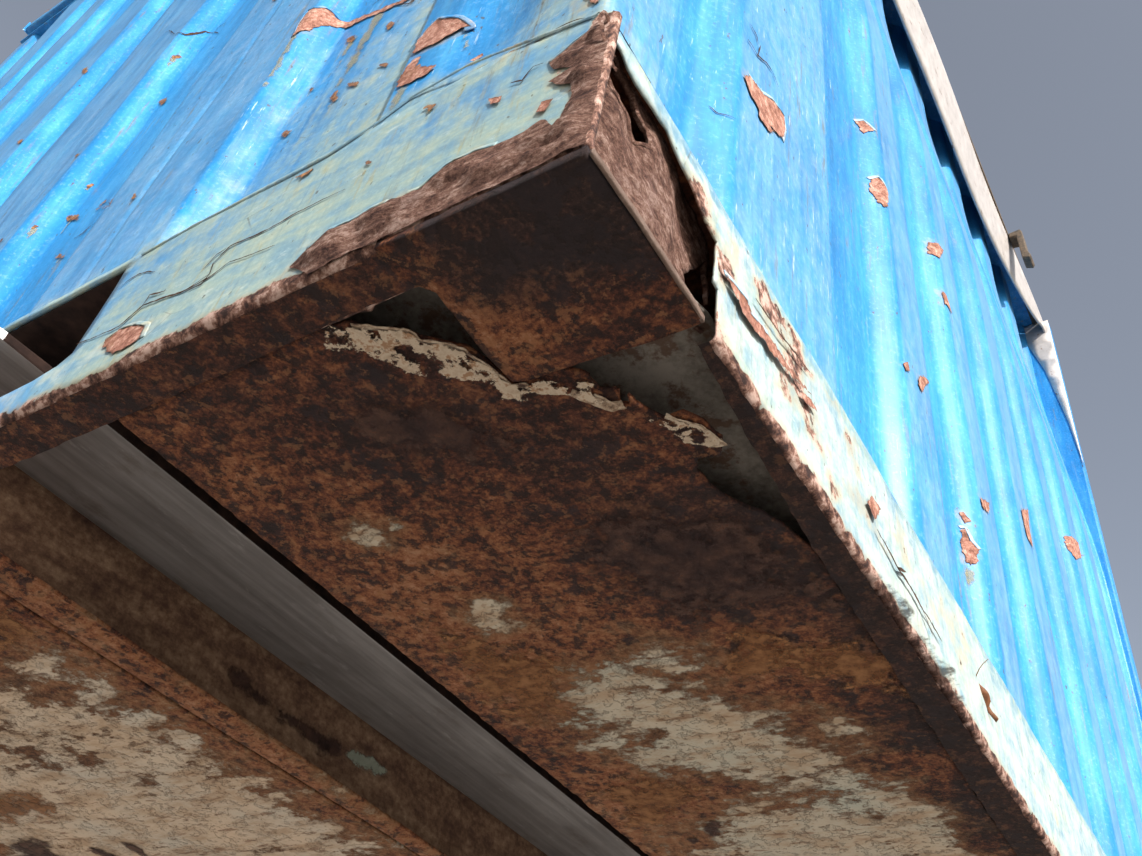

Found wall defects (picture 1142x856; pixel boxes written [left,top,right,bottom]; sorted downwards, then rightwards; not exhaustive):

peeling [265,0,407,84]
peeling [392,15,483,107]
peeling [744,74,787,143]
crack [77,191,340,344]
peeling [324,323,627,412]
peeling [649,413,728,448]
peeling [958,512,981,583]
rust [724,628,906,692]
rust [862,572,980,747]
rust [228,666,342,756]
rust [0,791,59,856]
rust [122,842,147,856]